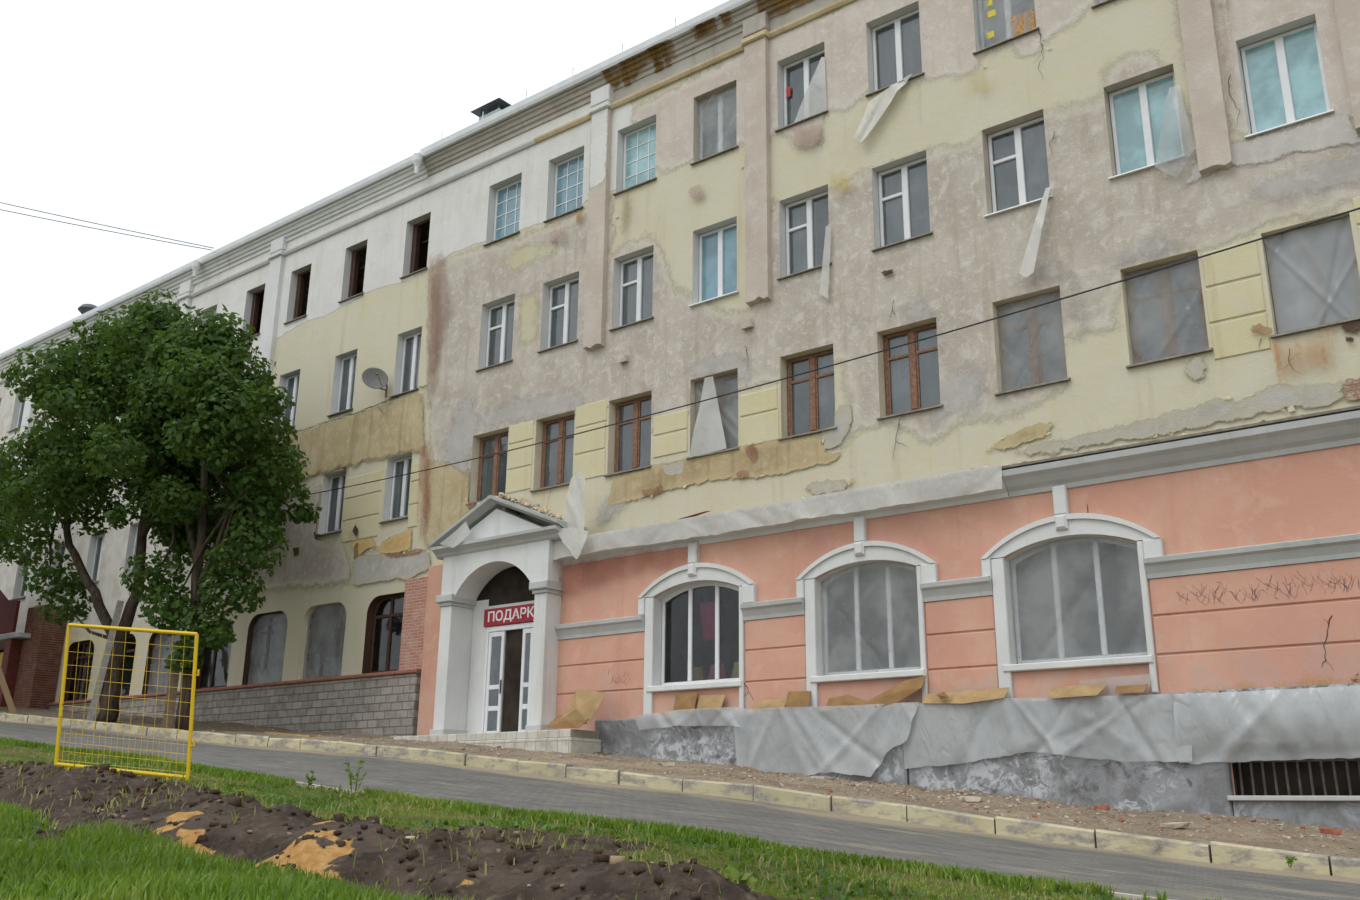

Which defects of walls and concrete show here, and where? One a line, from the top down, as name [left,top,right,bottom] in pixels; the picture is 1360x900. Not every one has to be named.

peeling [234,0,1360,592]
crack [1322,615,1334,671]